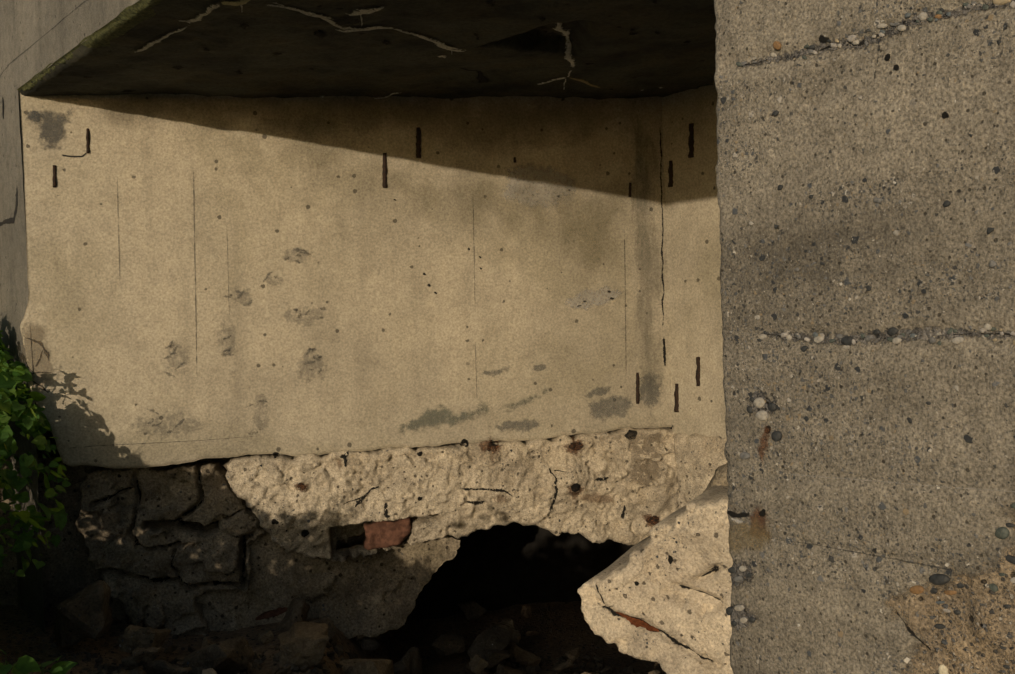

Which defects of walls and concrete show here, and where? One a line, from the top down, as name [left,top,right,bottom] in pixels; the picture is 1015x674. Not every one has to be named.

crack [137,0,488,83]
crack [538,22,600,89]
leakage [28,111,67,148]
leakage [401,407,487,430]
rust [750,509,769,538]